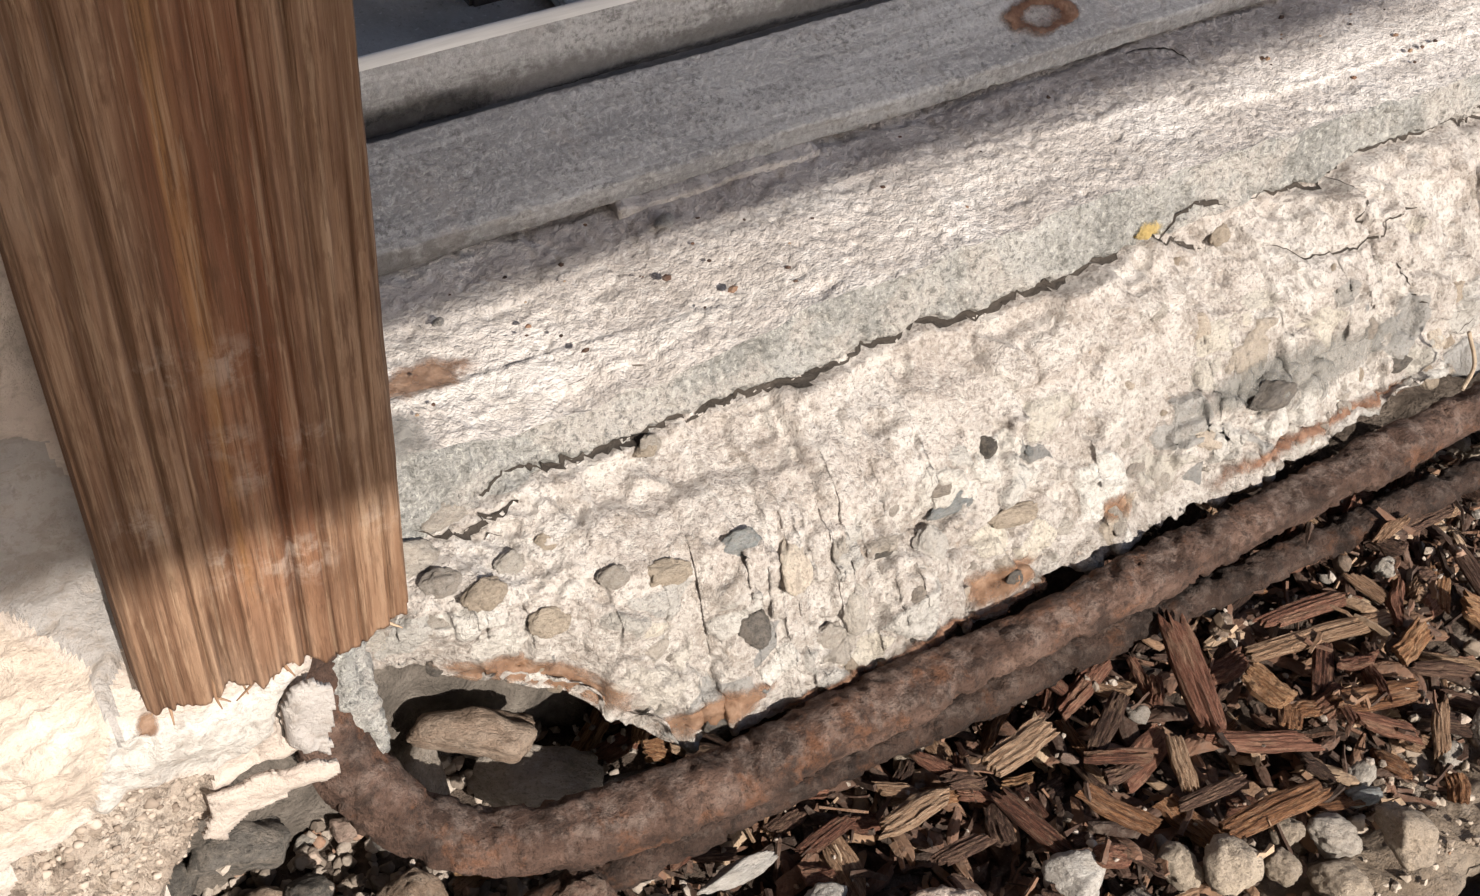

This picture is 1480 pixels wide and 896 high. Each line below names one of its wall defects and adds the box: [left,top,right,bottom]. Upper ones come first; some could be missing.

corrosion [1003,0,1080,35]
spalling [8,677,341,896]
corrosion [389,359,467,398]
corrosion [294,381,1480,896]
spalling [365,113,1480,754]
crack [415,105,1480,540]